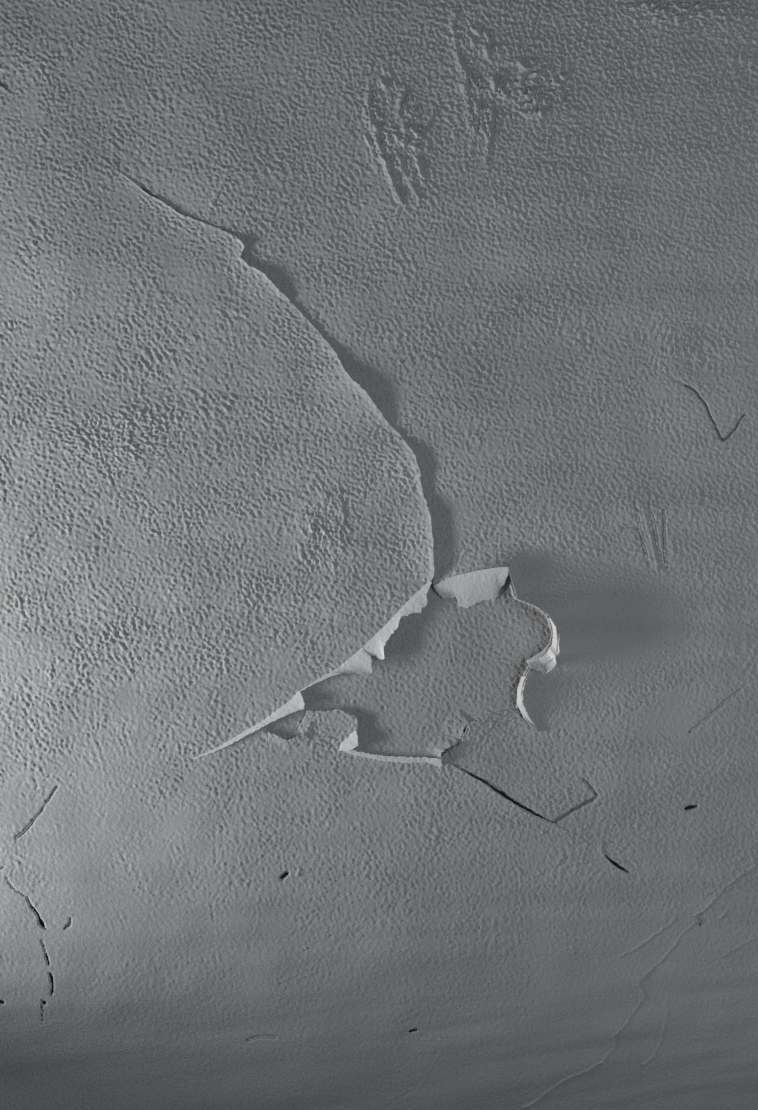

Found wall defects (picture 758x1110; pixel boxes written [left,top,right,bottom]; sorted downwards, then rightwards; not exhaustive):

peeling [194,543,697,769]
crack [16,786,57,839]
crack [437,761,630,880]
crack [0,866,53,1021]